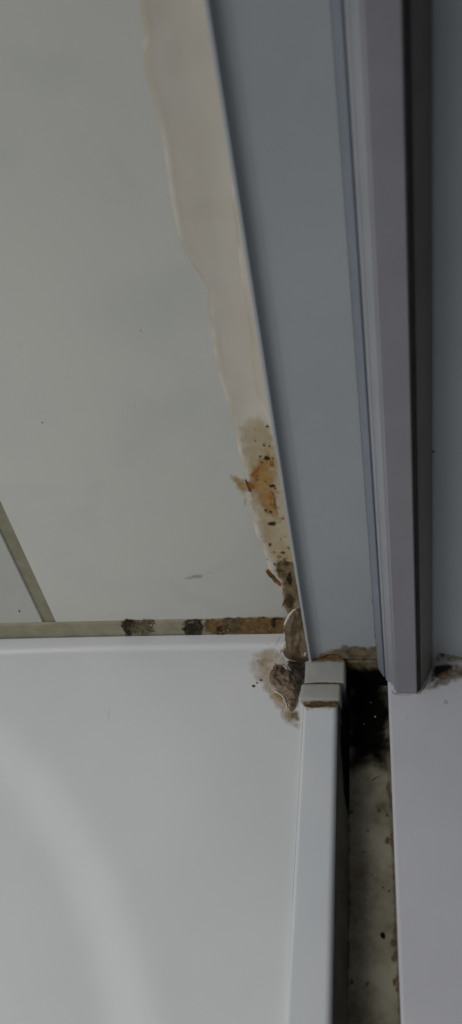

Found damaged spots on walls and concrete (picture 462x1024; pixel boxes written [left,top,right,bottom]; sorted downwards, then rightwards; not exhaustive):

damp [182,426,301,635]
corrosion [247,459,277,515]
damp [121,619,155,636]
damp [341,669,395,813]